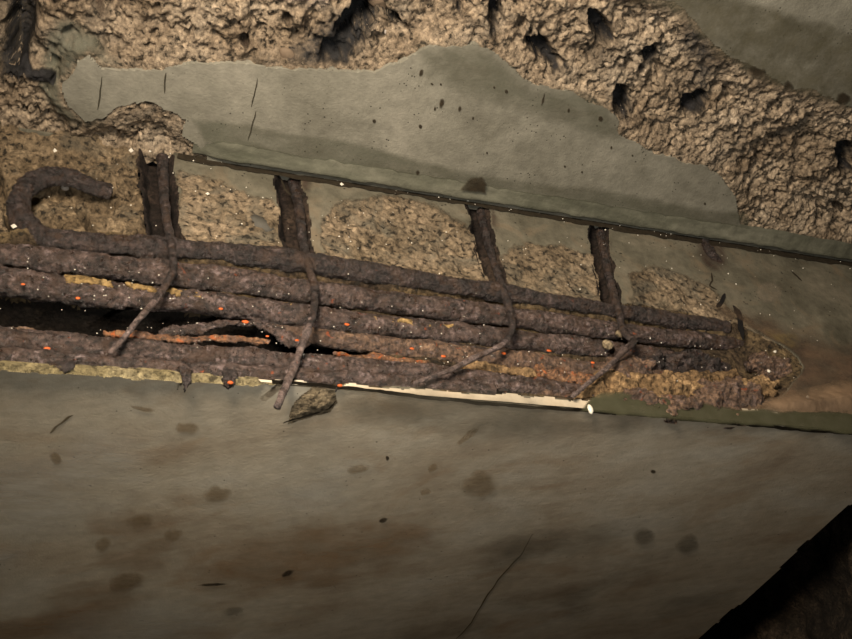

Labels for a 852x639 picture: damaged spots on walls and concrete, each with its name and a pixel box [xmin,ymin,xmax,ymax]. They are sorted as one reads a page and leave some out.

spalling [0,0,852,247]
corrosion [461,178,486,193]
spalling [320,194,489,281]
spalling [499,243,601,302]
spalling [0,297,367,355]
spalling [177,258,803,409]
corrosion [47,360,75,373]
spalling [0,360,223,384]
corrosion [178,367,193,392]
corrosion [221,368,238,390]
corrosion [572,347,792,424]
crack [456,534,533,639]